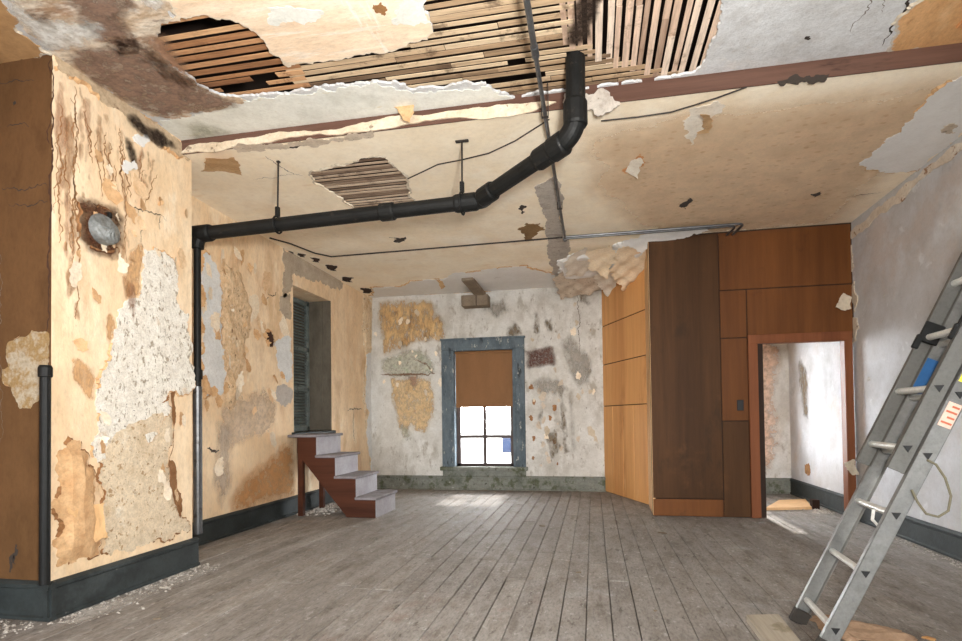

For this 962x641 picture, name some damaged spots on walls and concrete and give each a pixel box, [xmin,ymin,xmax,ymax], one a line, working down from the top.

flaking render [267,6,324,26]
flaking render [372,0,431,26]
crack [850,0,910,44]
leakage [8,0,246,147]
peeling [132,134,150,147]
flaking render [159,82,513,140]
flaking render [859,76,962,174]
leakage [52,86,157,319]
peeling [95,149,148,224]
spalling [2,330,50,409]
spalling [90,244,293,556]
flaking render [361,229,709,471]